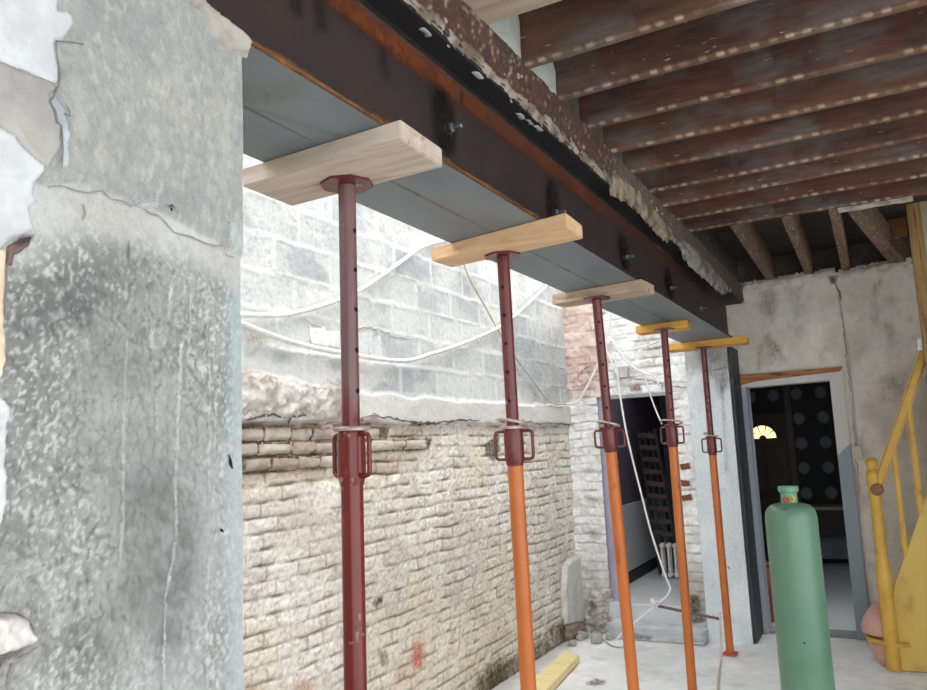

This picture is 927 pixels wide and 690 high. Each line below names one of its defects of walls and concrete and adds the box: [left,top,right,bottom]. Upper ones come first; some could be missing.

peeling [0,0,74,83]
crack [48,40,240,257]
rust [252,41,390,125]
rust [329,0,602,209]
peeling [0,128,44,378]
peeling [0,398,10,524]
spalling [228,425,338,475]
spalling [365,427,432,453]
crack [830,277,860,498]
spalling [0,612,38,690]